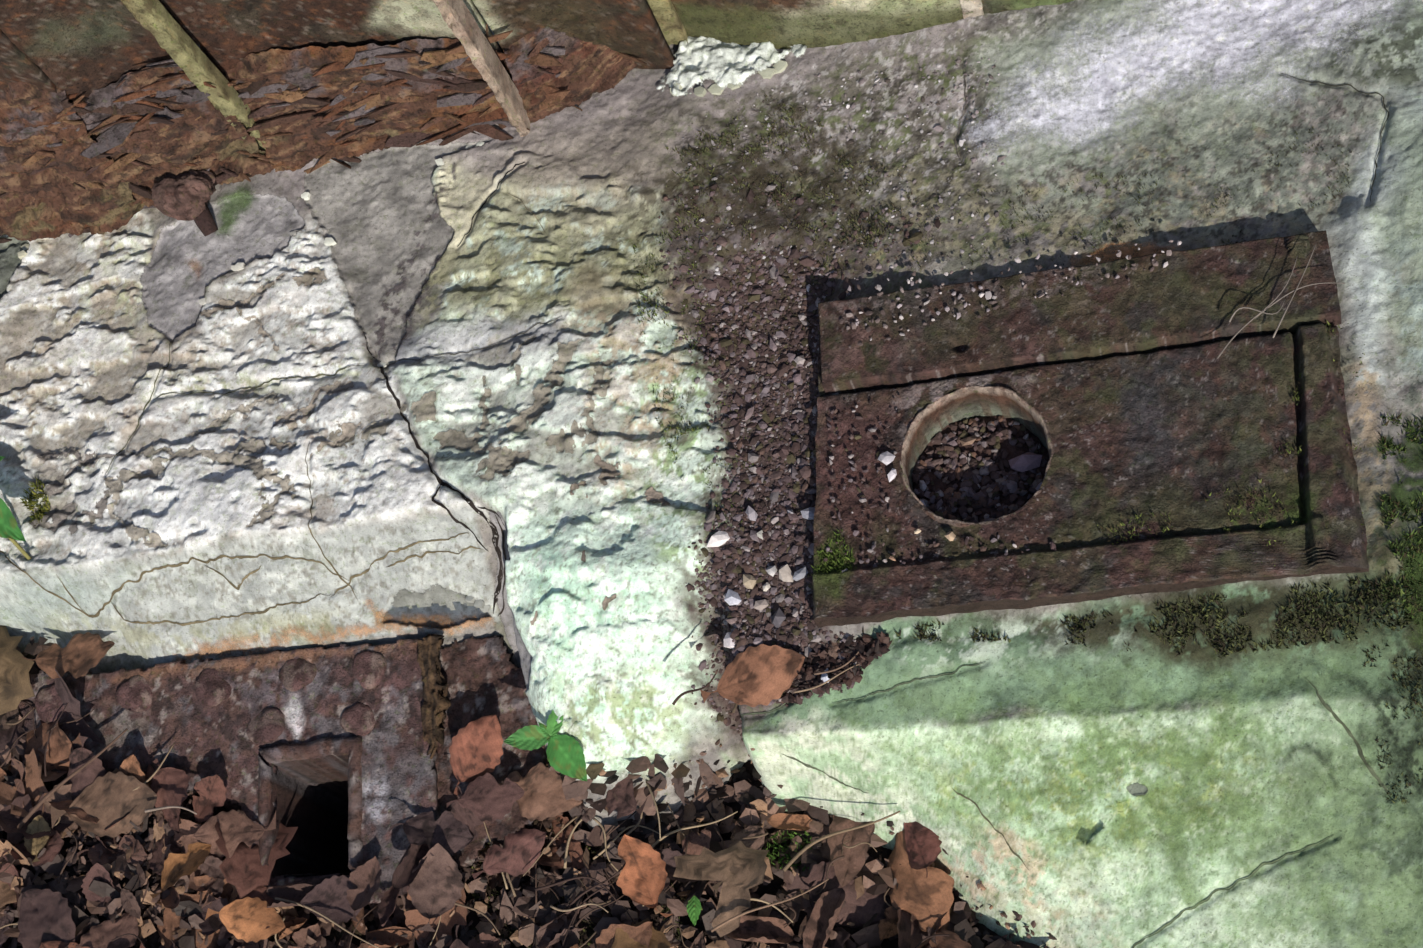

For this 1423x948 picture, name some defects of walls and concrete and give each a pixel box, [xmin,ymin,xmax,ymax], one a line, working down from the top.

crack [1281,73,1389,202]
crack [0,296,562,689]